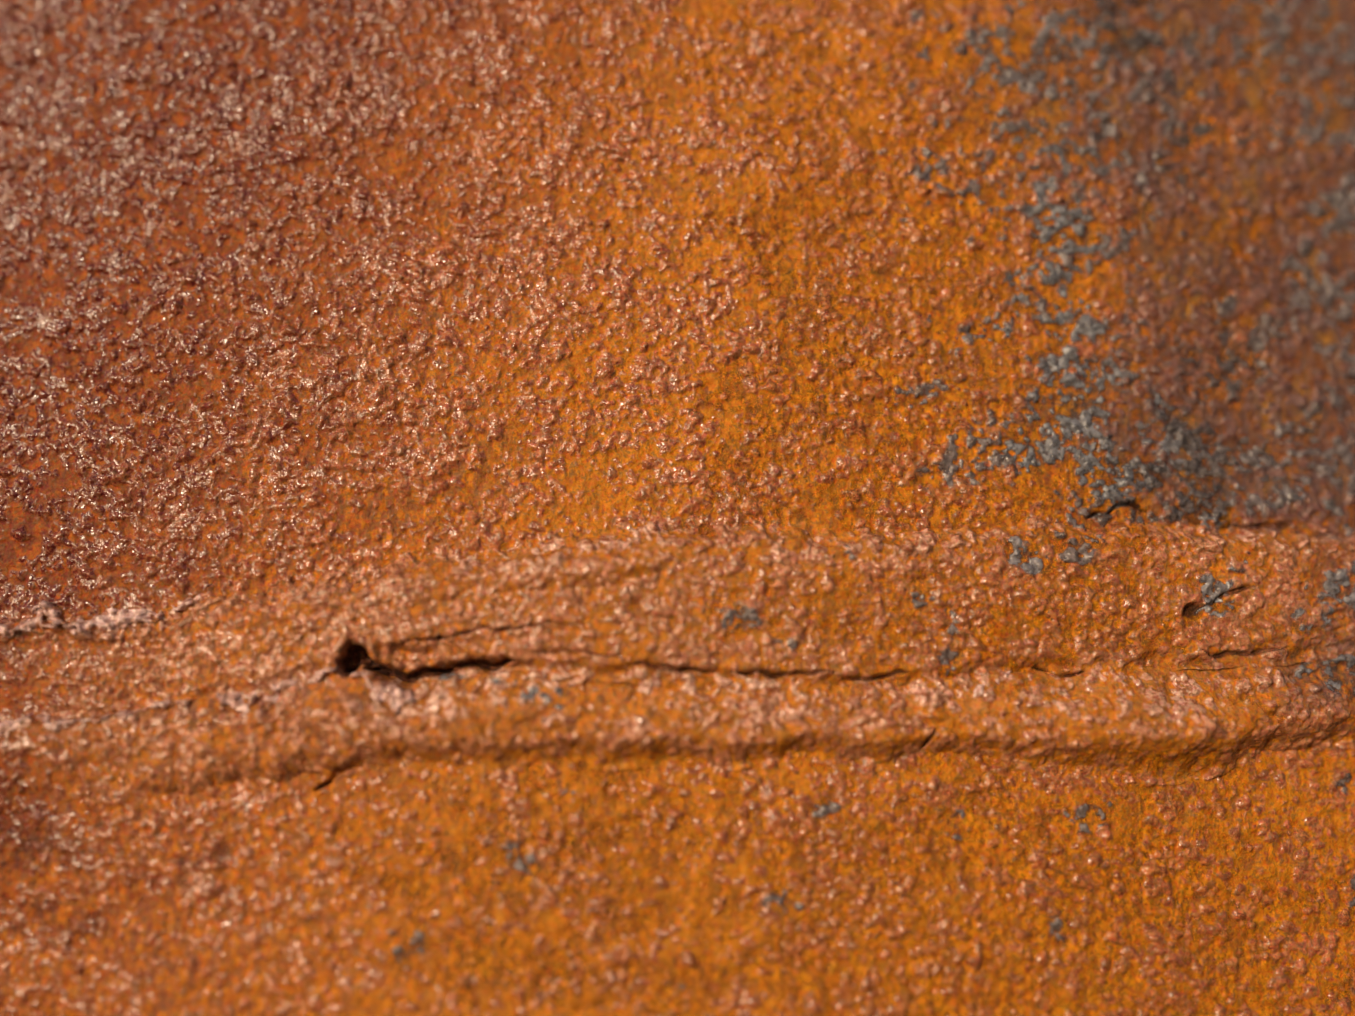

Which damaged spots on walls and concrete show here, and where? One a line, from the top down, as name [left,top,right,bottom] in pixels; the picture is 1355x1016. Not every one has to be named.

rust [1170,31,1345,189]
rust [661,0,1234,698]
rust [0,584,213,638]
crack [366,620,908,683]
rust [0,699,195,736]
rust [215,666,414,715]
rust [338,667,1355,1016]